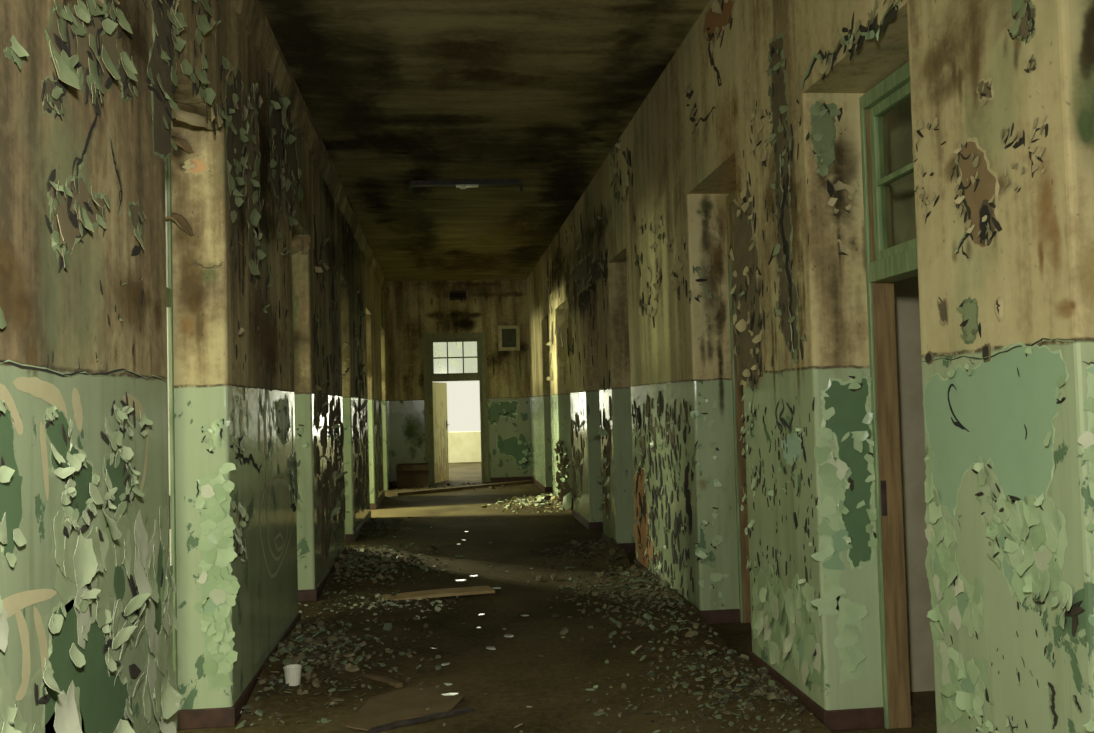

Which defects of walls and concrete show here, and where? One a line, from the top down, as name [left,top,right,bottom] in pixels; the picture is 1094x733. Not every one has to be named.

peeling [0,391,183,733]
peeling [41,0,382,571]
peeling [194,386,262,691]
water stain [239,109,274,280]
peeling [486,400,532,477]
spalling [544,204,611,520]
peeling [633,215,712,327]
spalling [631,391,729,606]
peeling [729,33,877,689]
peeling [912,114,1048,251]
peeling [923,296,1094,733]